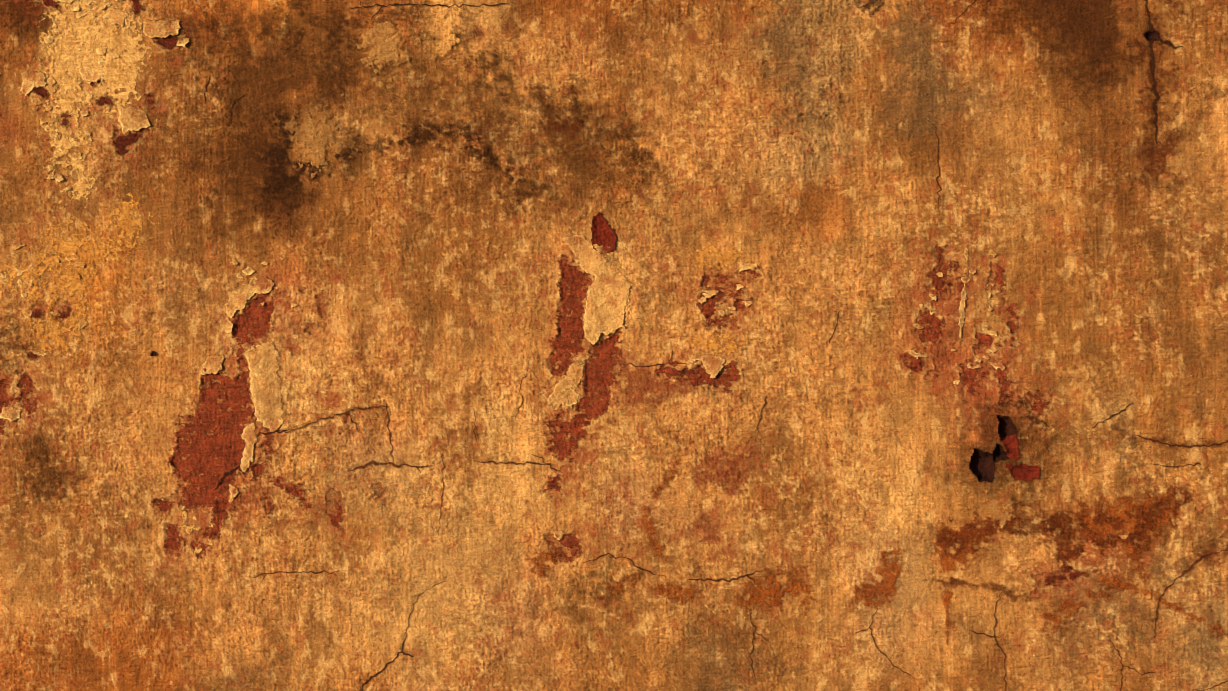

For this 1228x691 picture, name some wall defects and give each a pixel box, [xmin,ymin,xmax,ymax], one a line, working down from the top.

peeling [20,44,156,191]
peeling [42,0,190,49]
damp [261,114,314,194]
damp [390,126,512,178]
crack [1145,0,1183,144]
peeling [0,243,86,331]
peeling [694,261,760,332]
peeling [0,348,51,451]
peeling [150,257,346,559]
peeling [540,235,631,502]
peeling [655,354,744,395]
peeling [901,244,1050,481]